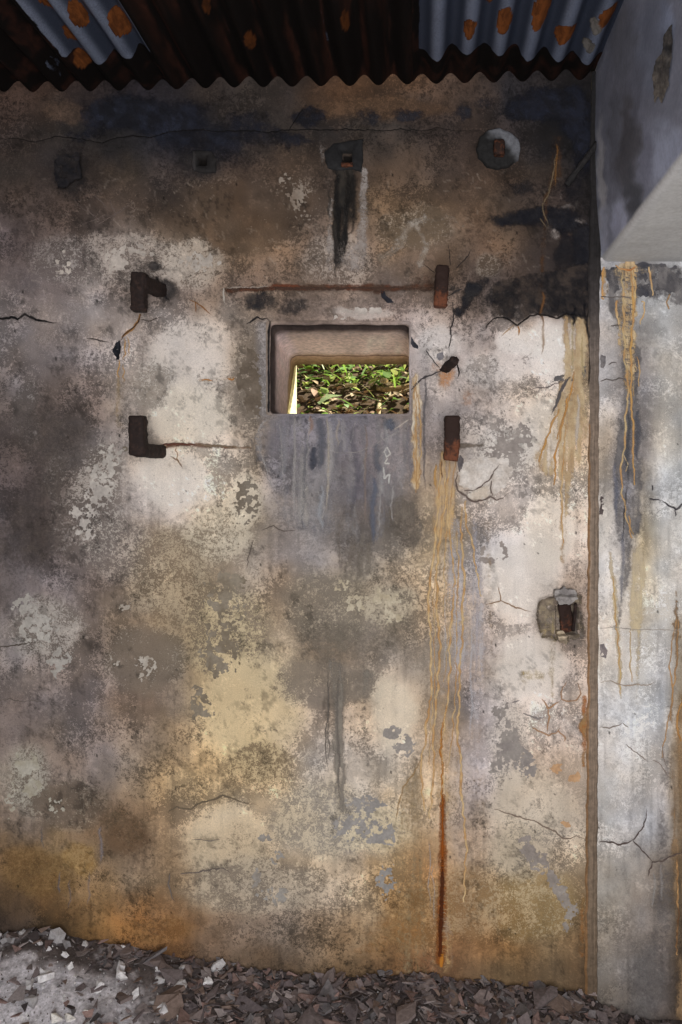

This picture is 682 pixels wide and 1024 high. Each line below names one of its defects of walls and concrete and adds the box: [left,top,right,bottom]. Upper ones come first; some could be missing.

crack [0,110,466,143]
damp [328,159,367,272]
crack [0,313,53,323]
crack [486,313,575,329]
corrosion [536,316,588,560]
crack [455,467,505,502]
corrosion [601,262,654,696]
spalling [536,595,585,642]
corrosion [410,374,481,967]
damp [327,661,346,812]
crack [169,795,249,811]
crack [496,809,682,876]